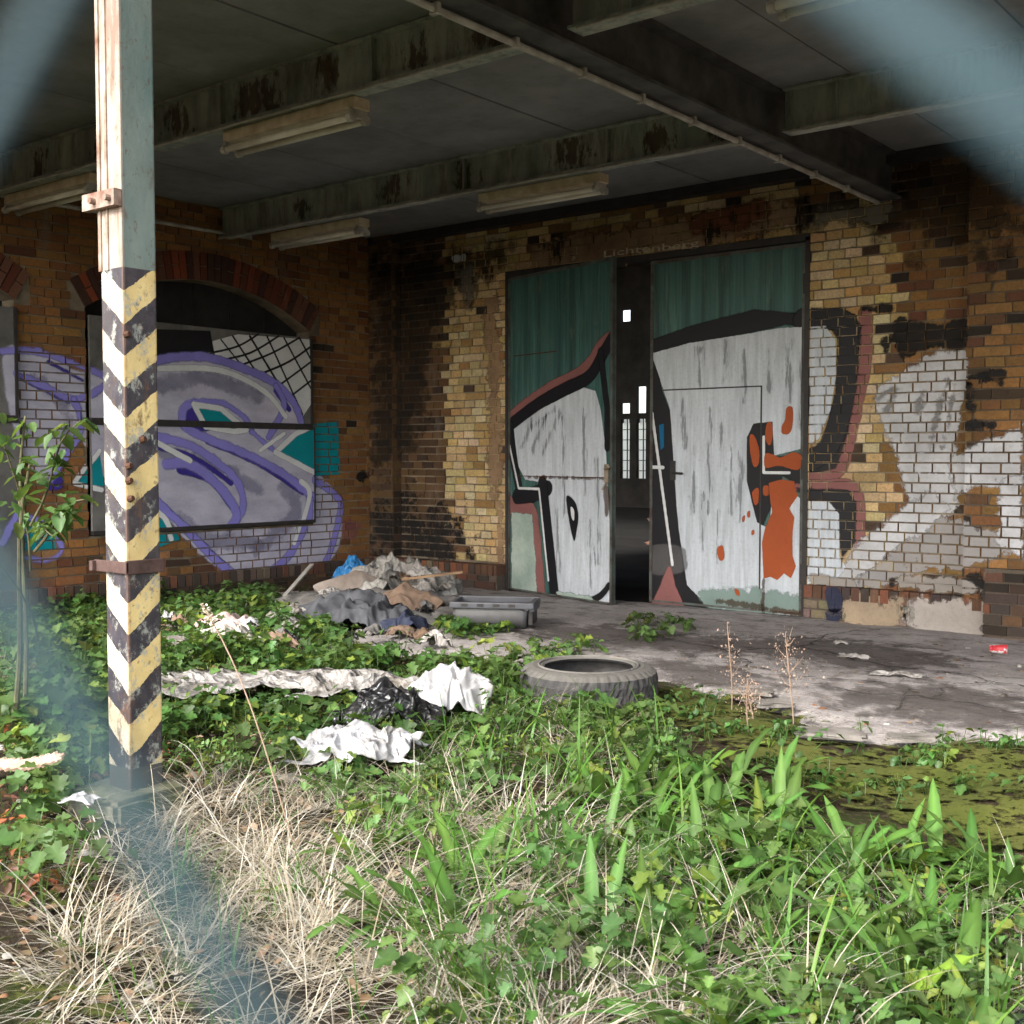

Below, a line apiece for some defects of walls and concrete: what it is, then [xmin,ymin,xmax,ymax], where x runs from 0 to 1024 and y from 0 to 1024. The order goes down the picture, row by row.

corrosion [472,30,504,50]
corrosion [233,74,286,120]
corrosion [548,136,597,170]
spalling [840,590,984,635]